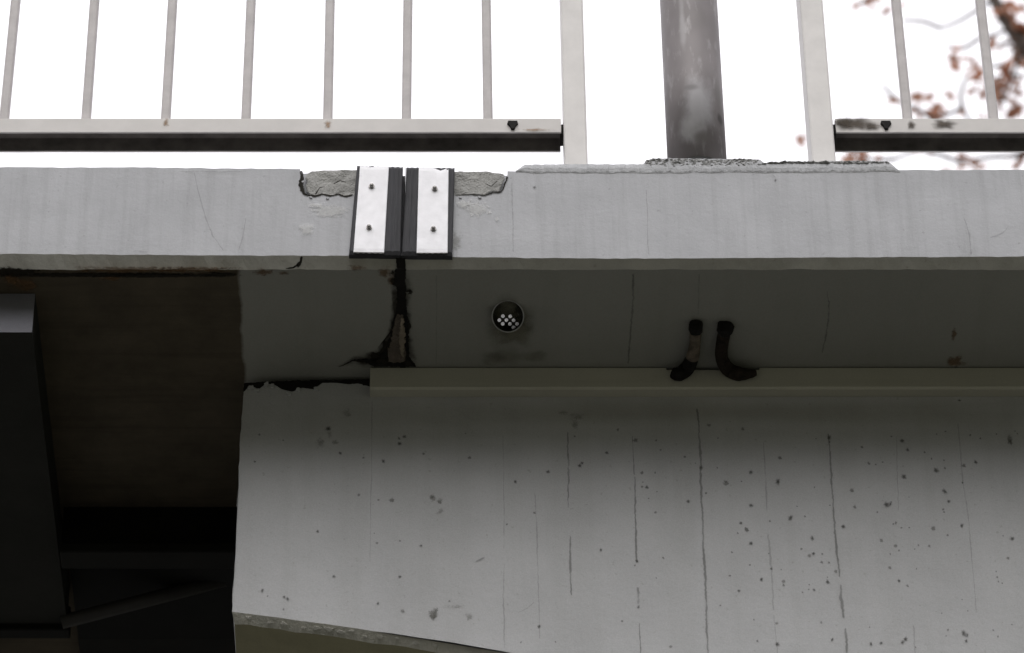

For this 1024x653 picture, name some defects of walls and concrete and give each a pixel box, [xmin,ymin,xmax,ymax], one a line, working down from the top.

spalling [298,170,357,200]
spalling [454,171,508,199]
crack [286,257,303,269]
crack [339,258,416,367]
spalling [243,379,370,396]